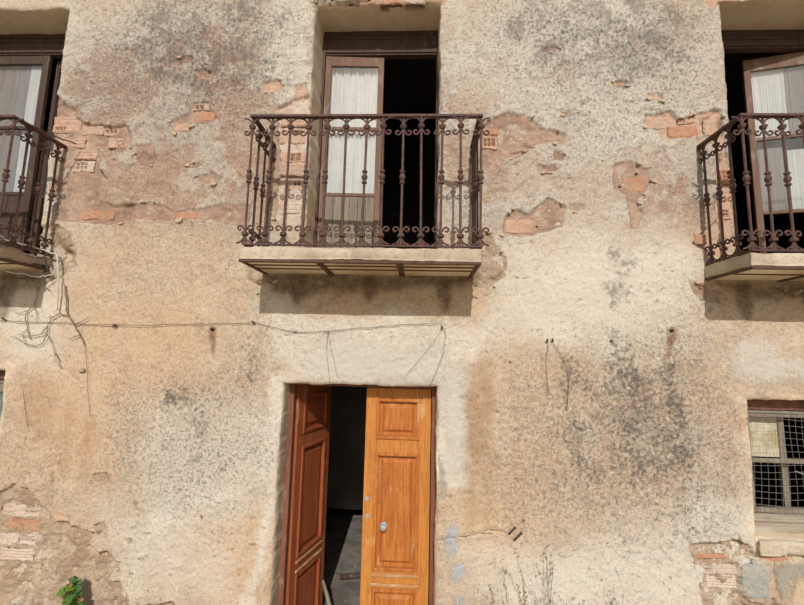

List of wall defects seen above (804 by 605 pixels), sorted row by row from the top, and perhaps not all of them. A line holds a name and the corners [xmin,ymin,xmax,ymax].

flaking render [314,0,446,12]
flaking render [702,0,746,10]
flaking render [479,114,566,174]
flaking render [37,97,251,281]
damp [274,275,475,308]
flaking render [0,484,129,605]
flaking render [689,537,789,605]
peeling [790,579,804,605]